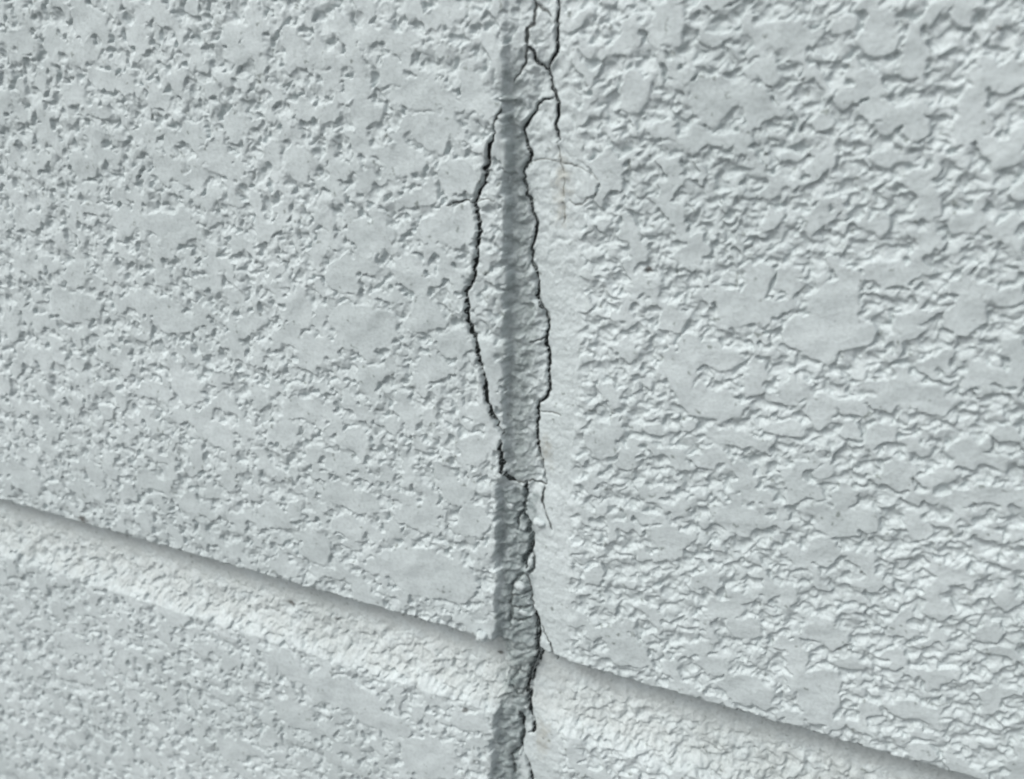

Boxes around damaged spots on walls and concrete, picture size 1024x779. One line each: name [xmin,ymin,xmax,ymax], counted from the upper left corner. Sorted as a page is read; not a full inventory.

crack [447,0,598,779]